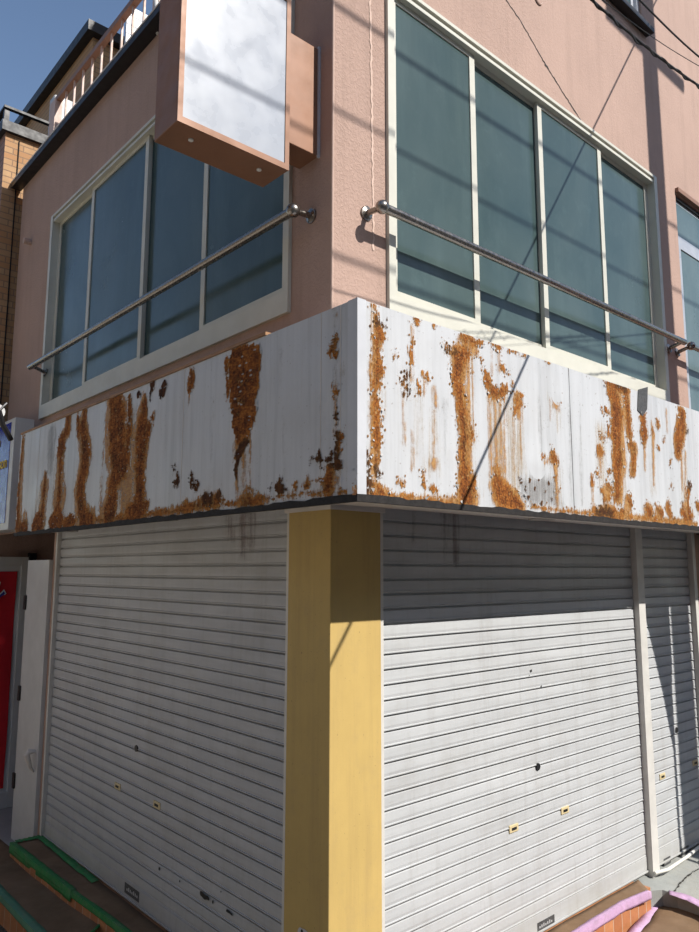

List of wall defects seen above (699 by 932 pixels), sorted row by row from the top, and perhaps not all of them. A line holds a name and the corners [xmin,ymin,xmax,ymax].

corrosion [14,304,699,533]